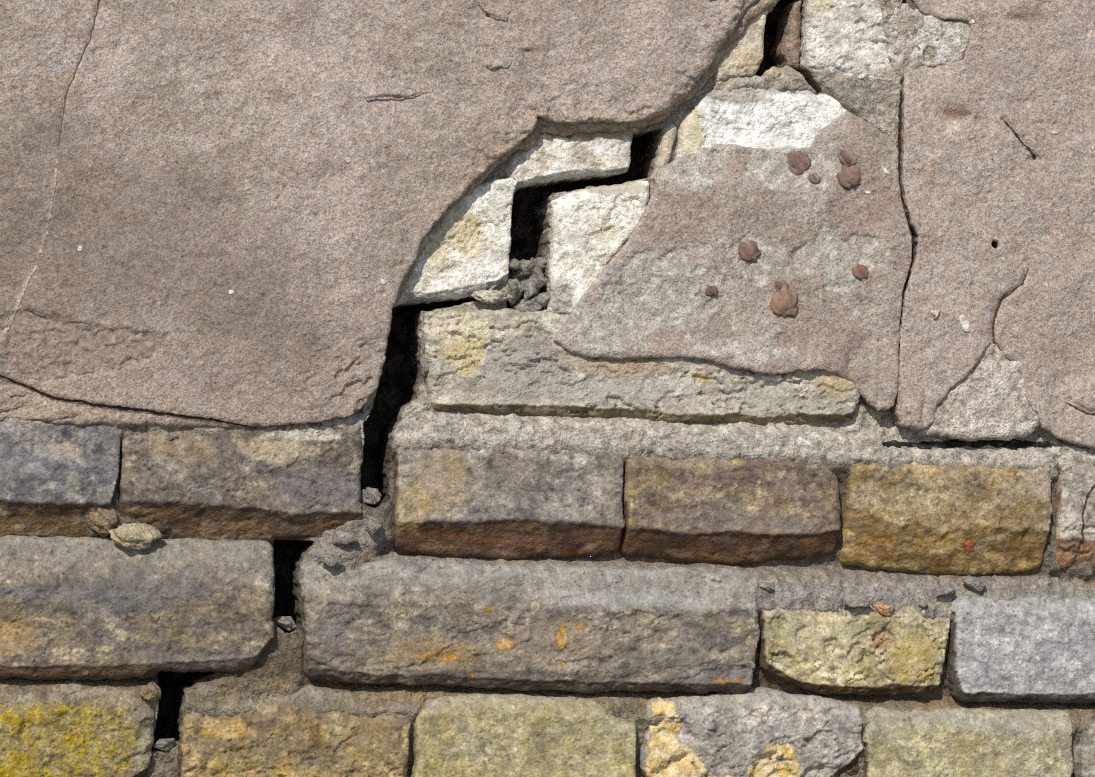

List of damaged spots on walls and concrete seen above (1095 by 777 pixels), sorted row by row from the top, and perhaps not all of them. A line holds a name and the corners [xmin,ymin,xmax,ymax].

crack [756,0,786,76]
crack [906,0,919,11]
crack [1,0,100,336]
crack [506,136,646,309]
crack [897,79,916,290]
crack [0,375,258,429]
crack [360,299,479,504]
crack [1072,461,1095,562]
crack [272,540,304,627]
crack [154,671,198,742]